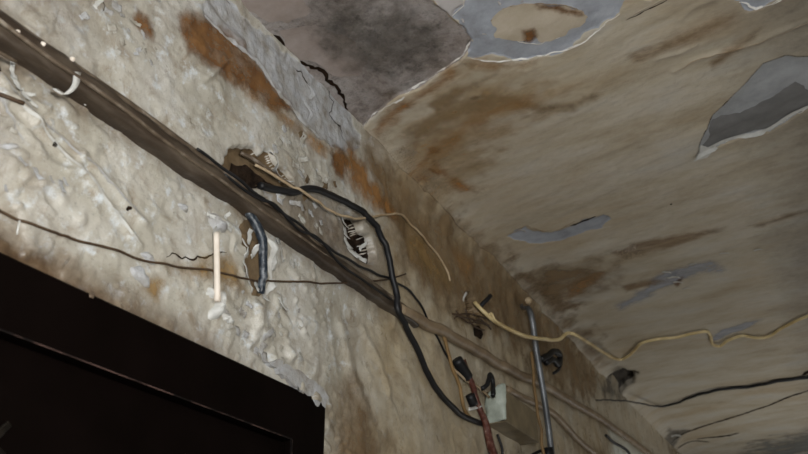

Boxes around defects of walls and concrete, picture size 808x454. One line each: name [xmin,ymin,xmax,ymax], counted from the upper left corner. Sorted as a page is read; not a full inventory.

corrosion [134,13,153,37]
peeling [735,0,781,11]
peeling [0,61,39,109]
corrosion [180,14,293,124]
spalling [202,0,624,235]
spalling [694,55,808,161]
corrosion [305,133,398,219]
peeling [224,219,328,408]
spalling [341,217,368,264]
leakage [367,147,600,398]
peeling [508,214,611,244]
crack [671,371,808,448]